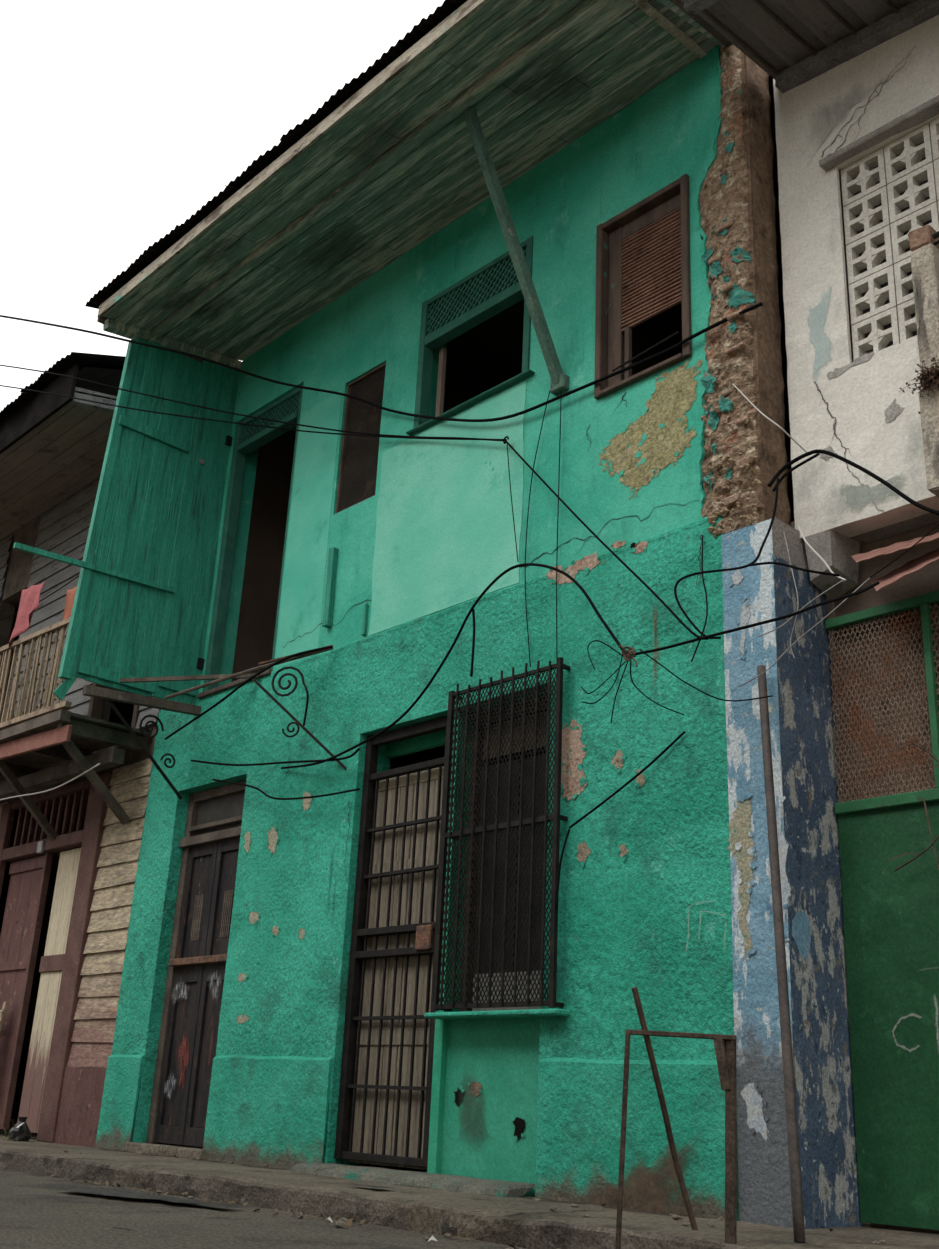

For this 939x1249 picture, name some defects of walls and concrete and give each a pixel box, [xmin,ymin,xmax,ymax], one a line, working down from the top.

crack [821,45,917,157]
spalling [599,44,791,538]
peeling [542,539,648,585]
spalling [611,750,645,788]
peeling [300,791,312,810]
peeling [266,826,279,856]
spalling [575,842,591,868]
spalling [617,843,629,862]
peeling [727,786,791,958]
peeling [247,912,280,938]
peeling [741,1079,769,1142]